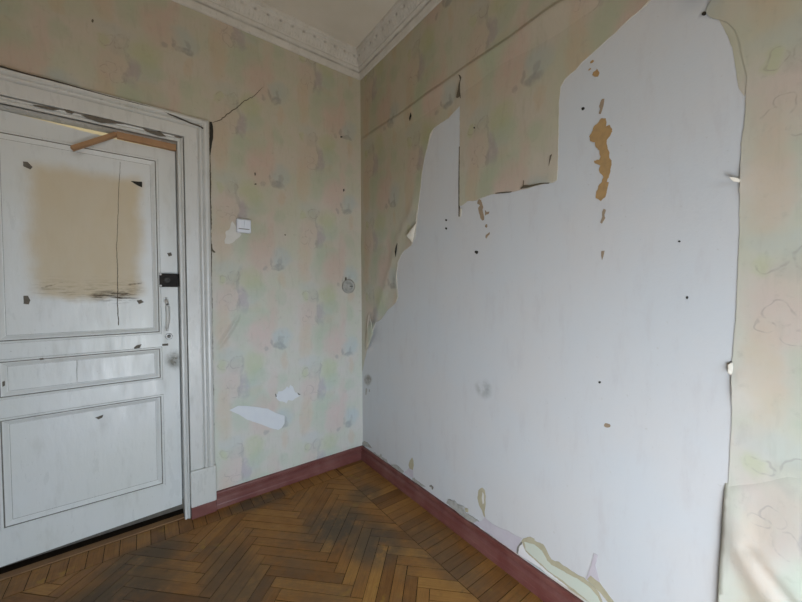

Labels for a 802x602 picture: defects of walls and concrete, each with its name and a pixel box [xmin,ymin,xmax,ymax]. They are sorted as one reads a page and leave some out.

crack [213,88,262,123]
peeling [362,0,747,602]